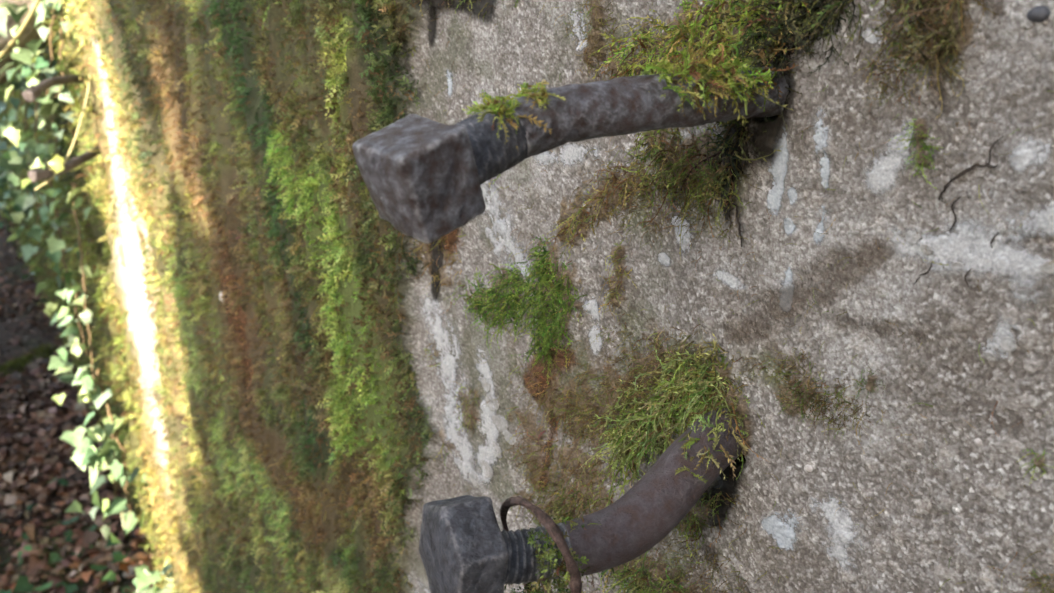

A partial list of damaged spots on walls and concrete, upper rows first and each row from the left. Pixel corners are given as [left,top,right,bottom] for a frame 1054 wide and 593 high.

corrosion [441,229,459,255]
leakage [420,239,499,483]